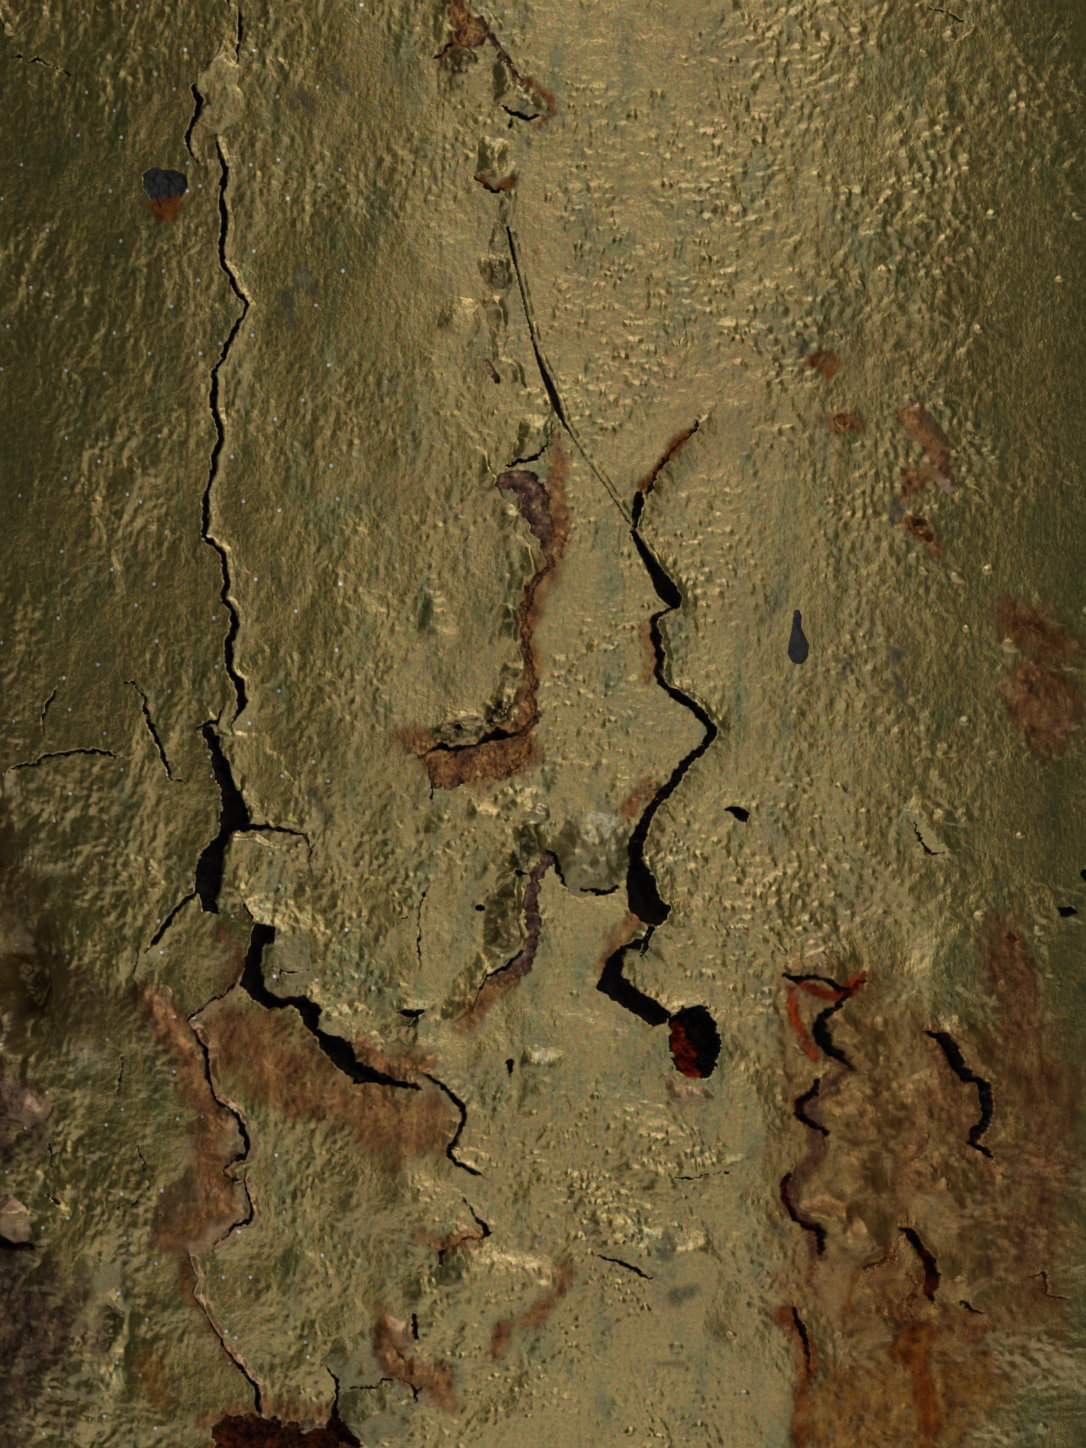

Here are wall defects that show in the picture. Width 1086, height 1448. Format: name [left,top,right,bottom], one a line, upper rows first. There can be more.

corrosion [441,0,480,58]
corrosion [524,77,555,125]
peeling [142,168,187,201]
corrosion [391,447,569,789]
crack [505,226,717,1026]
crack [0,0,492,1413]
crack [417,716,537,800]
crack [782,972,868,1147]
crack [924,1029,995,1165]
corrosion [774,913,1078,1448]
crack [862,1227,986,1315]
peeling [209,1412,360,1448]